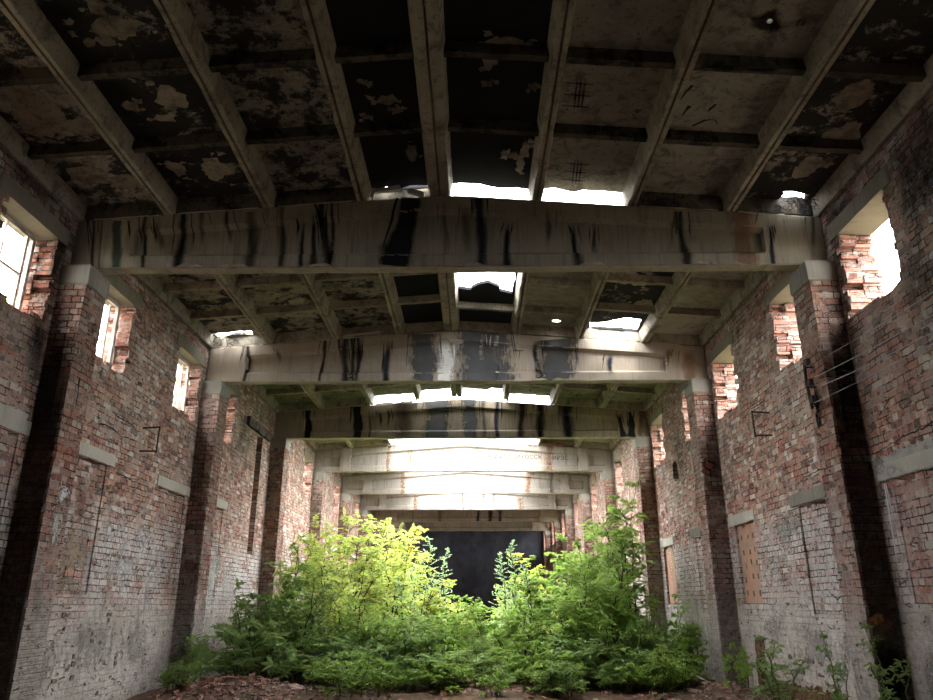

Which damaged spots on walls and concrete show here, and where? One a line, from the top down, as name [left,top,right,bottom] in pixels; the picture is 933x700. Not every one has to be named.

peeling [61,0,158,47]
peeling [122,80,197,122]
peeling [809,79,875,140]
peeling [201,152,236,186]
spalling [500,138,535,175]
peeling [772,150,835,178]
leakage [379,197,420,267]
leakage [458,199,488,266]
leakage [406,331,520,381]
leakage [533,338,579,381]
leakage [422,399,503,438]
leakage [514,403,547,437]